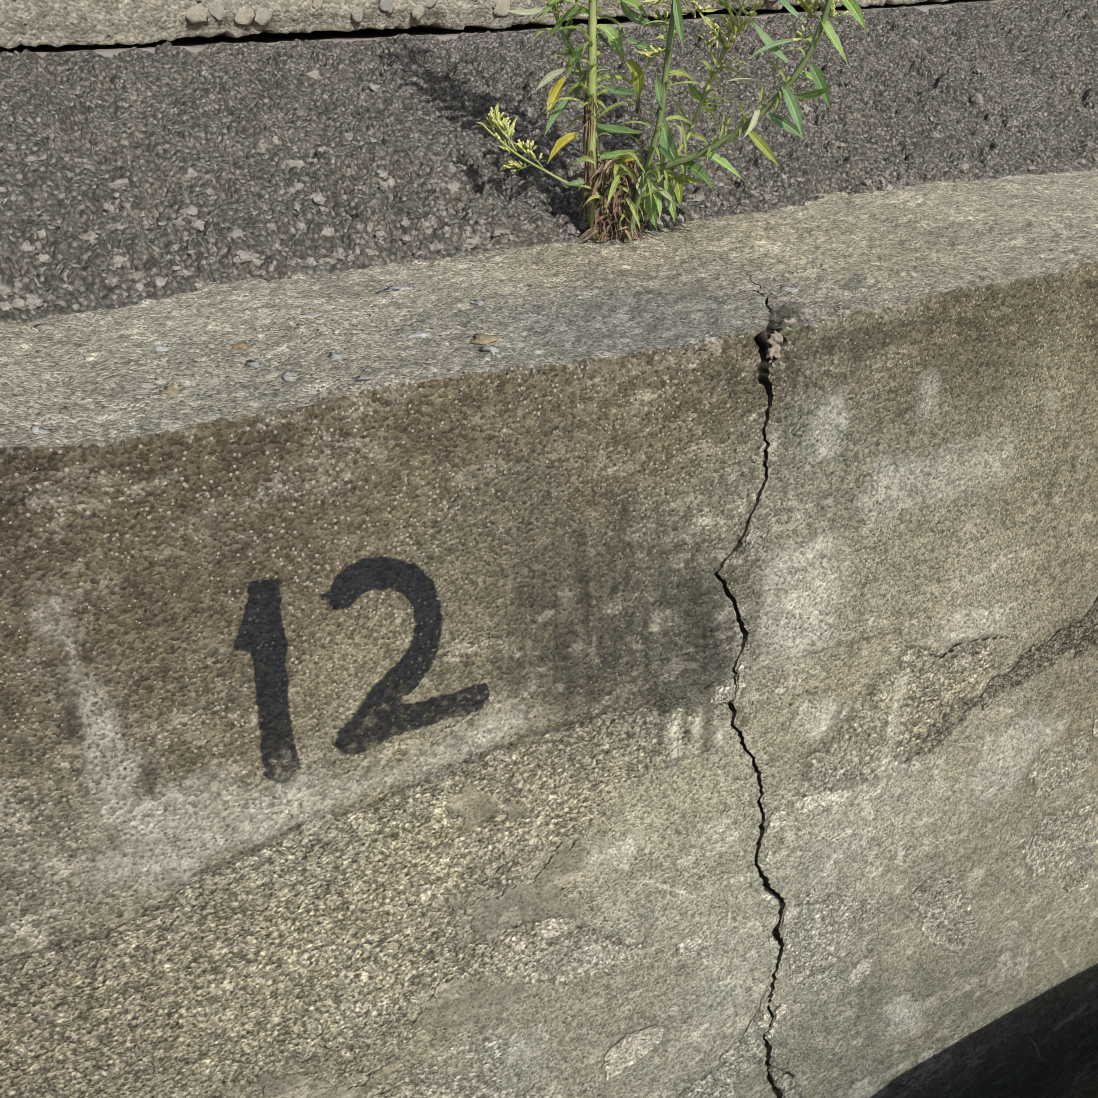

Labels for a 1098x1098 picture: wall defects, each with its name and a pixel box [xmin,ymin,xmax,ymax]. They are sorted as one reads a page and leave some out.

crack [658,240,825,1098]
crack [926,636,1008,659]
water stain [661,704,723,758]